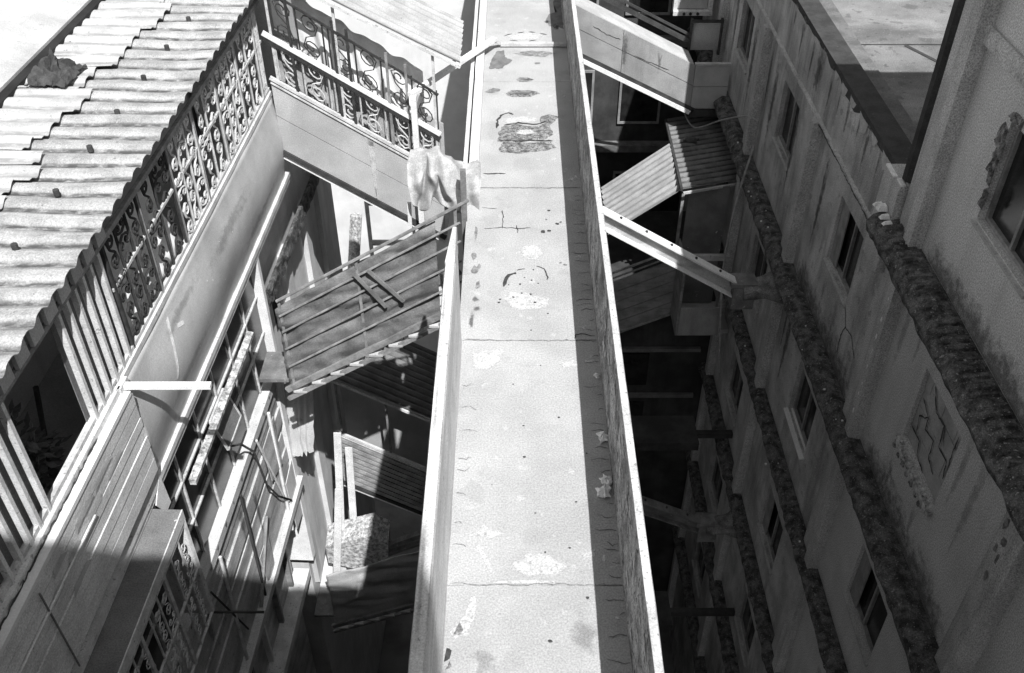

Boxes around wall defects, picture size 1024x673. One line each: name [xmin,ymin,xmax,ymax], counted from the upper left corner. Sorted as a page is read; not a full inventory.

spalling [486,77,540,97]
spalling [496,112,559,153]
spalling [977,112,1024,210]
crack [469,173,610,473]
crack [450,503,630,664]